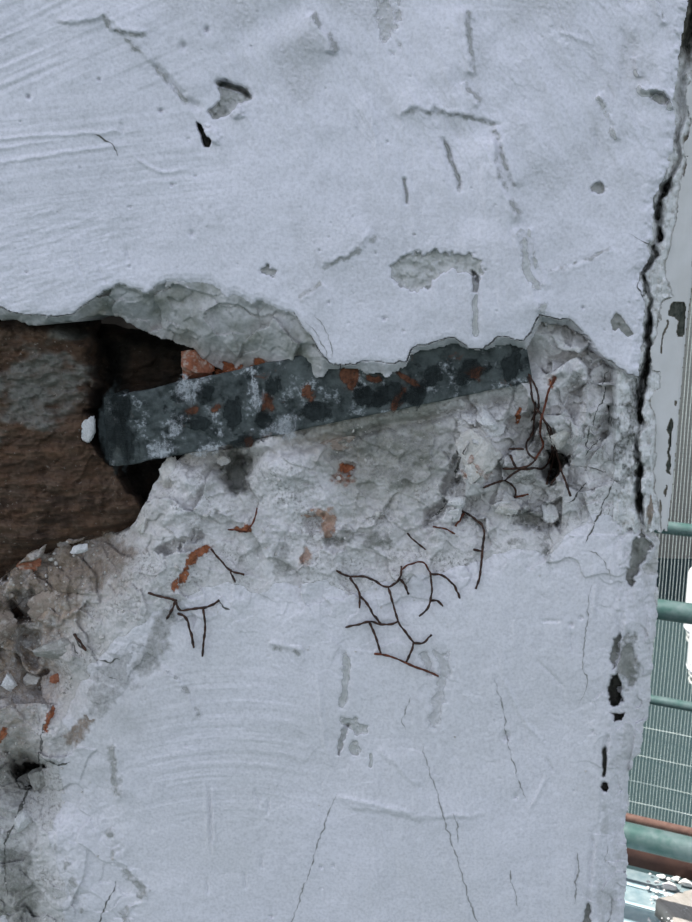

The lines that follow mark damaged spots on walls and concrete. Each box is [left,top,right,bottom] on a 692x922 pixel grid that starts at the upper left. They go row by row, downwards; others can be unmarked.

flaking render [209,79,252,119]
flaking render [390,249,483,337]
flaking render [0,281,592,378]
flaking render [611,313,634,337]
corrosion [214,358,265,375]
corrosion [339,364,382,391]
flaking render [81,416,96,443]
flaking render [626,533,653,586]
flaking render [610,634,639,686]
crack [600,748,608,776]
crack [291,797,336,922]
crack [422,747,478,922]